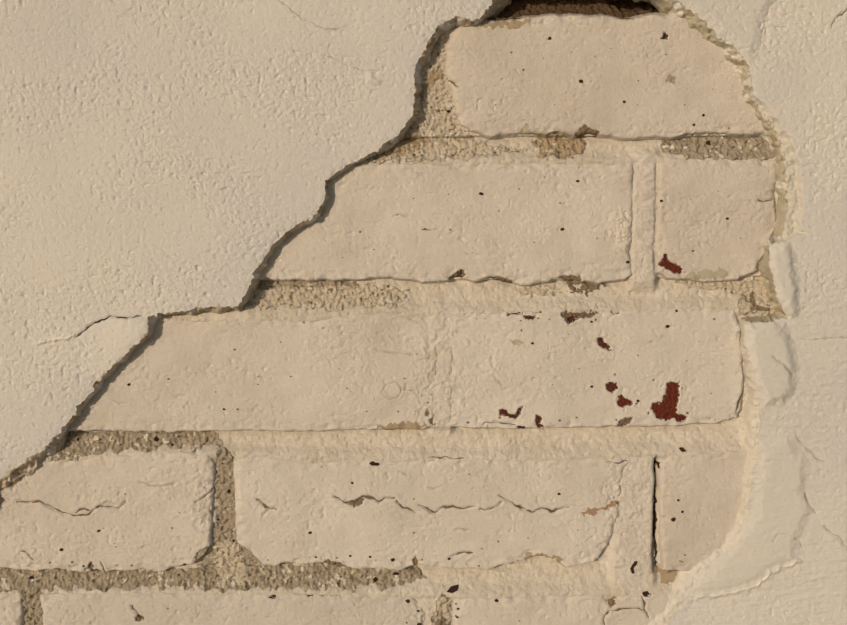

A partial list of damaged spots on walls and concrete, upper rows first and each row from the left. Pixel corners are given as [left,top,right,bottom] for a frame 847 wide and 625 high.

spalling [319,0,806,324]
crack [75,315,142,338]
peeling [498,406,525,428]
peeling [605,374,640,427]
peeling [648,380,689,422]
crack [16,500,126,516]
crack [333,486,569,531]
crack [630,458,657,574]
spalling [648,520,799,625]
peeling [405,585,460,625]